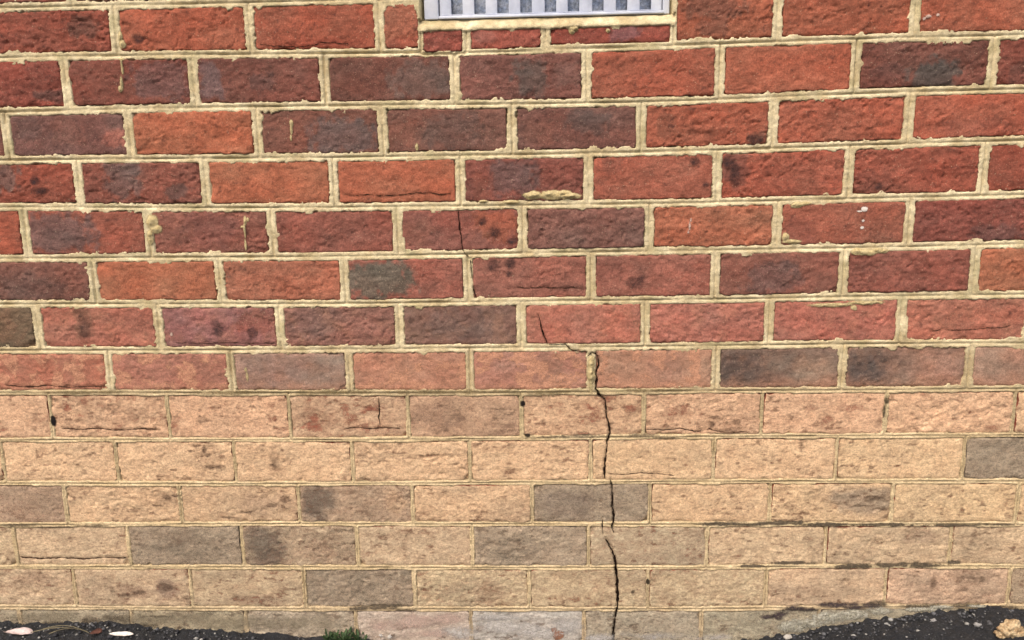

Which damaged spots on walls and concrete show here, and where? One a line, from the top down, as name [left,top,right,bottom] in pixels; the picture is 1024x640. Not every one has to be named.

crack [538,315,673,640]